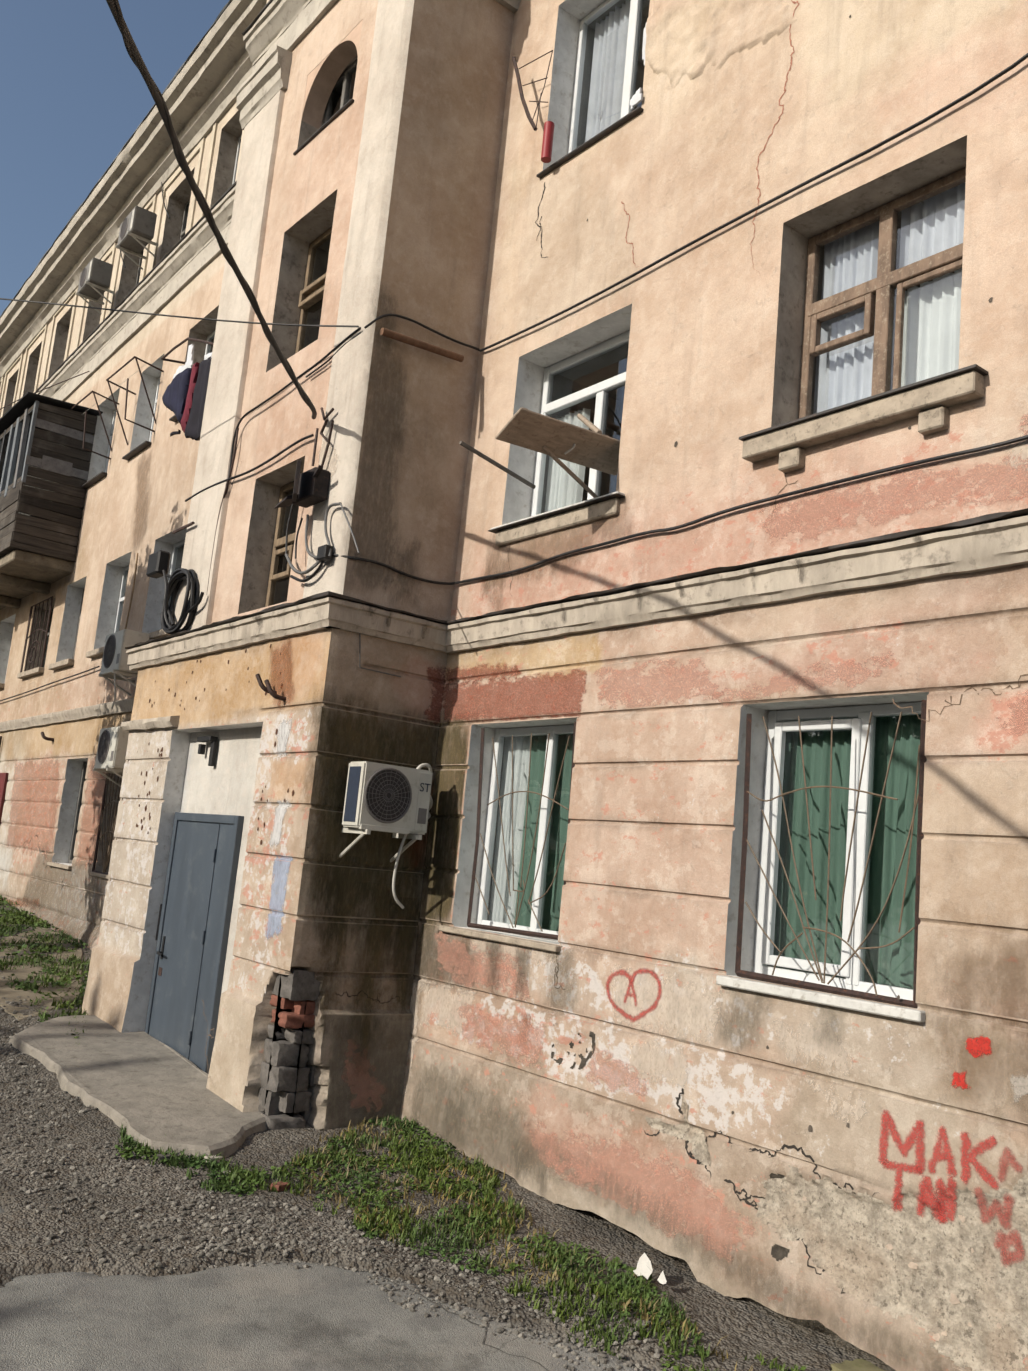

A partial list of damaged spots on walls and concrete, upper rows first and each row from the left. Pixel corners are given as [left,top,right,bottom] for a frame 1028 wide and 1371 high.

crack [750,0,800,272]
peeling [425,664,586,725]
damp [311,704,467,1066]
spalling [551,1031,595,1070]
crack [644,1088,875,1210]
crack [797,1238,845,1294]
spalling [756,1165,1028,1371]